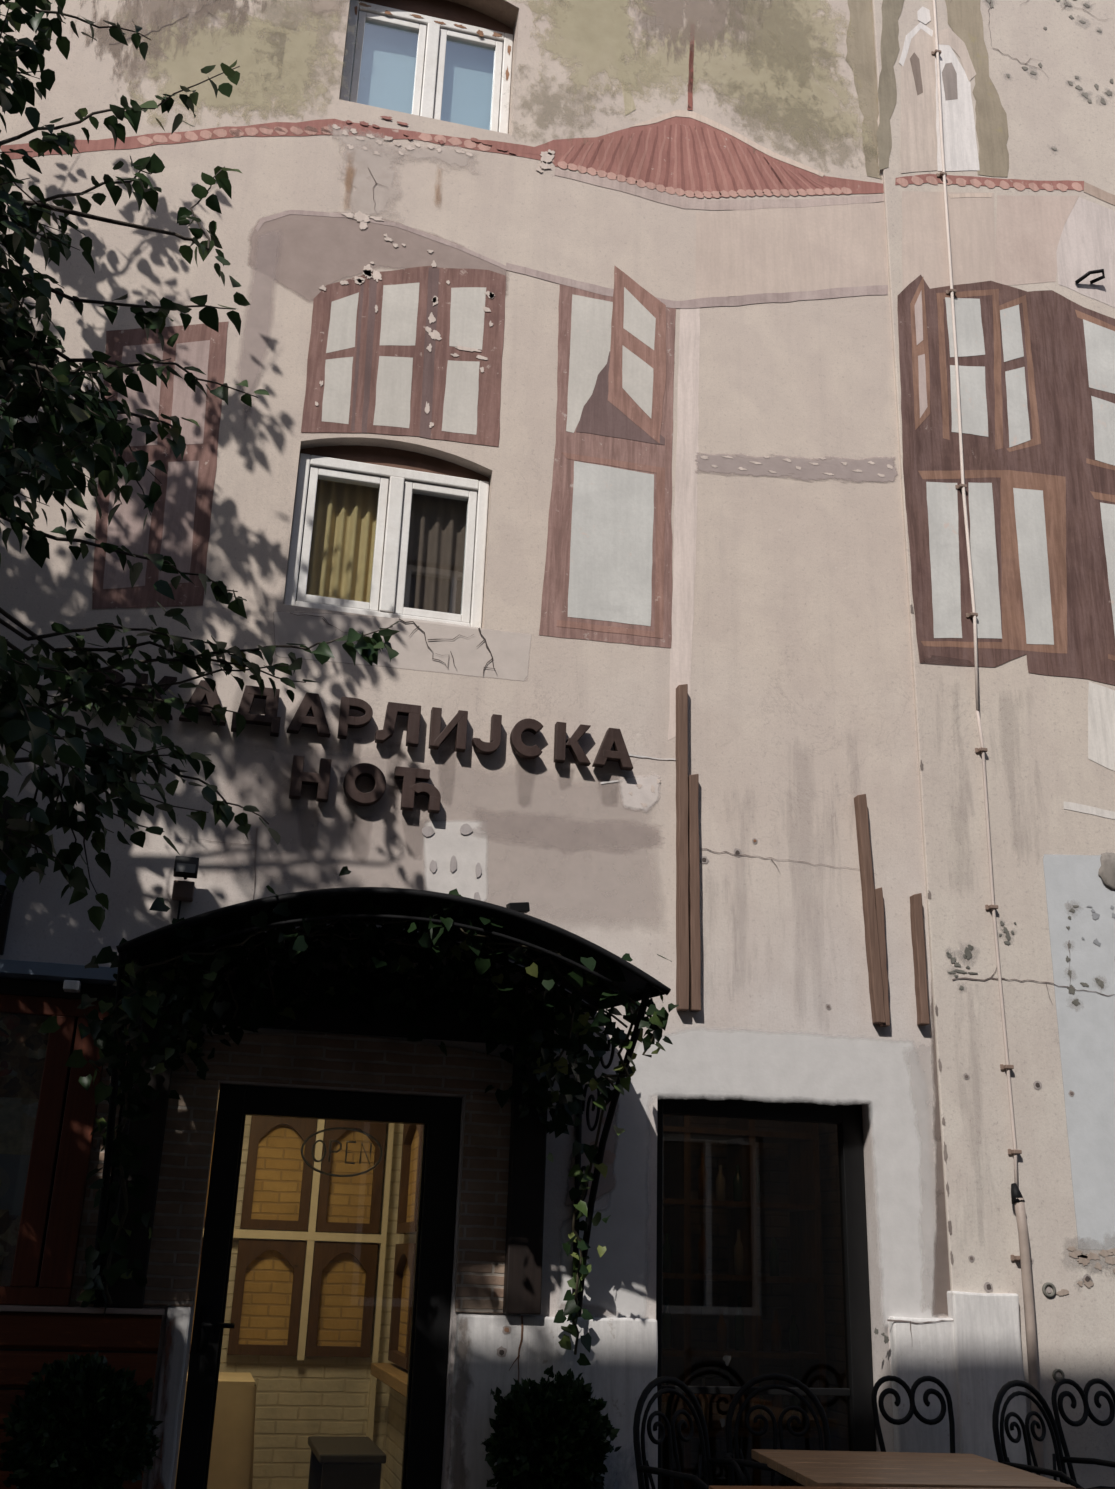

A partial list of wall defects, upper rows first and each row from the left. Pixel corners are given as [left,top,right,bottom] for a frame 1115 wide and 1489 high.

peeling [412,14,511,80]
crack [988,0,1049,78]
peeling [332,116,516,247]
peeling [536,149,555,173]
peeling [319,262,382,291]
peeling [425,280,487,373]
crack [399,619,497,675]
spalling [1066,905,1115,1006]
spalling [1056,1246,1115,1296]